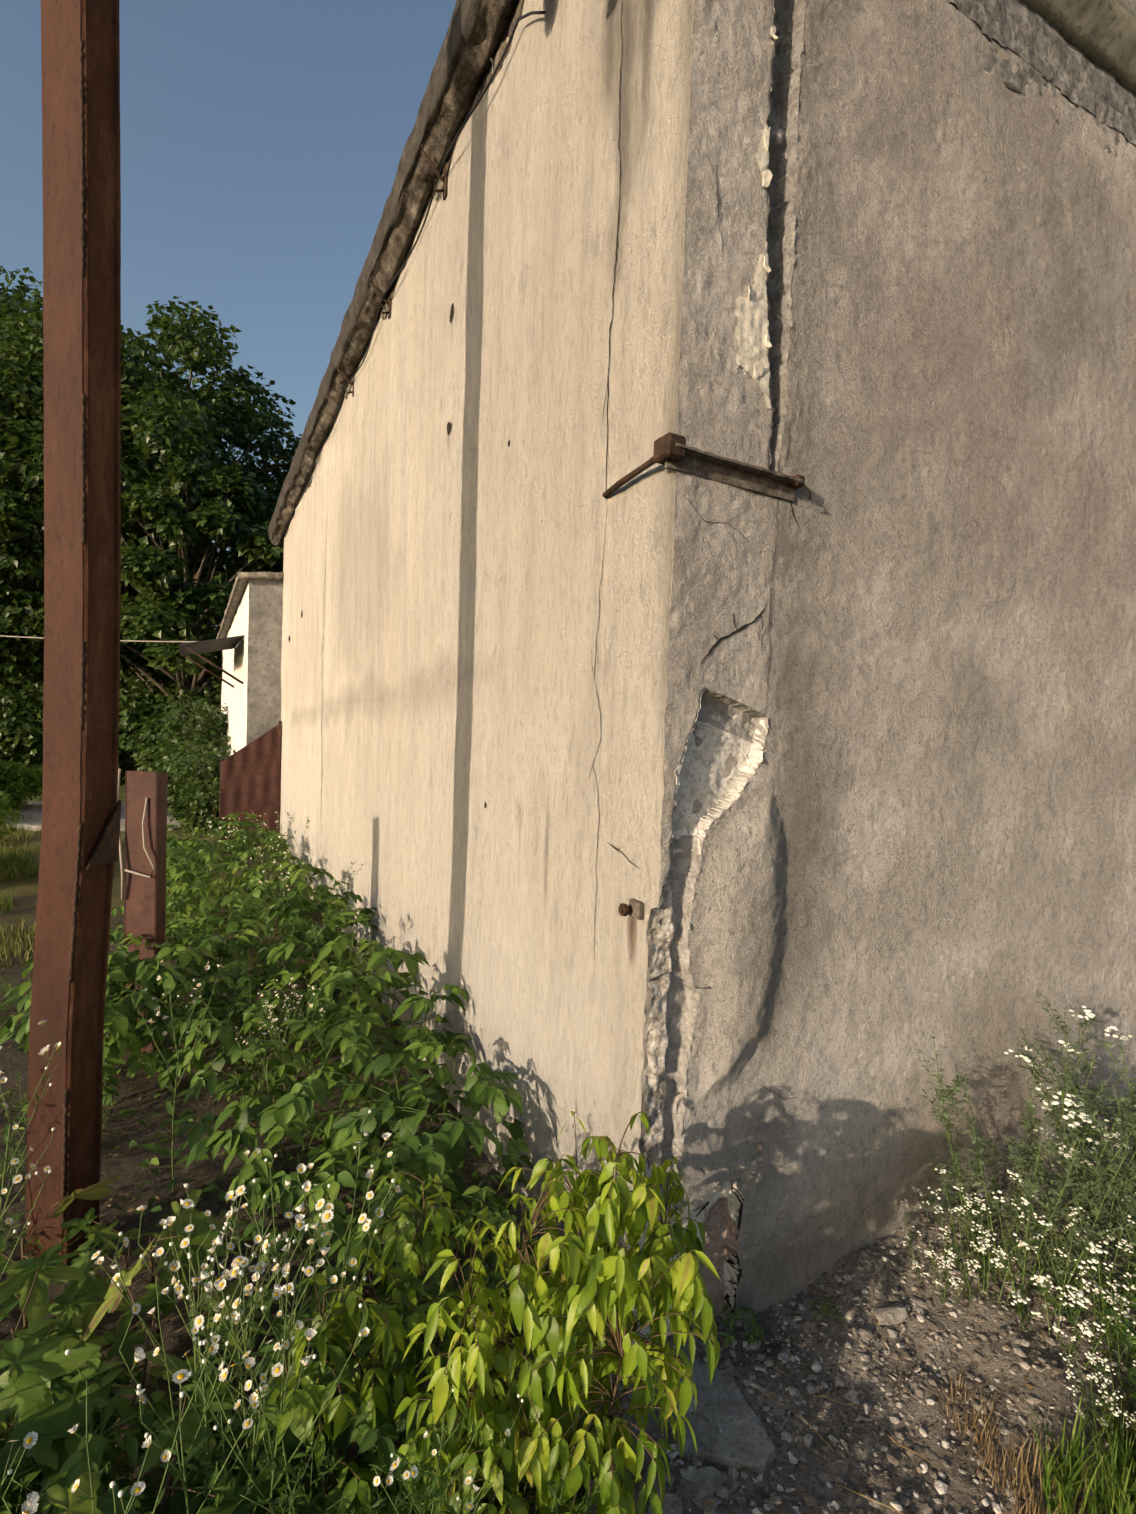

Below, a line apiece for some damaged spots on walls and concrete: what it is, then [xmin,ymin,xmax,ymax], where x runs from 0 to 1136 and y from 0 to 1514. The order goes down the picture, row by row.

crack [588,0,640,959]
crack [689,0,805,714]
peeling [734,241,771,409]
peeling [756,125,769,177]
flaking render [631,1305,673,1346]
flaking render [637,690,769,1329]